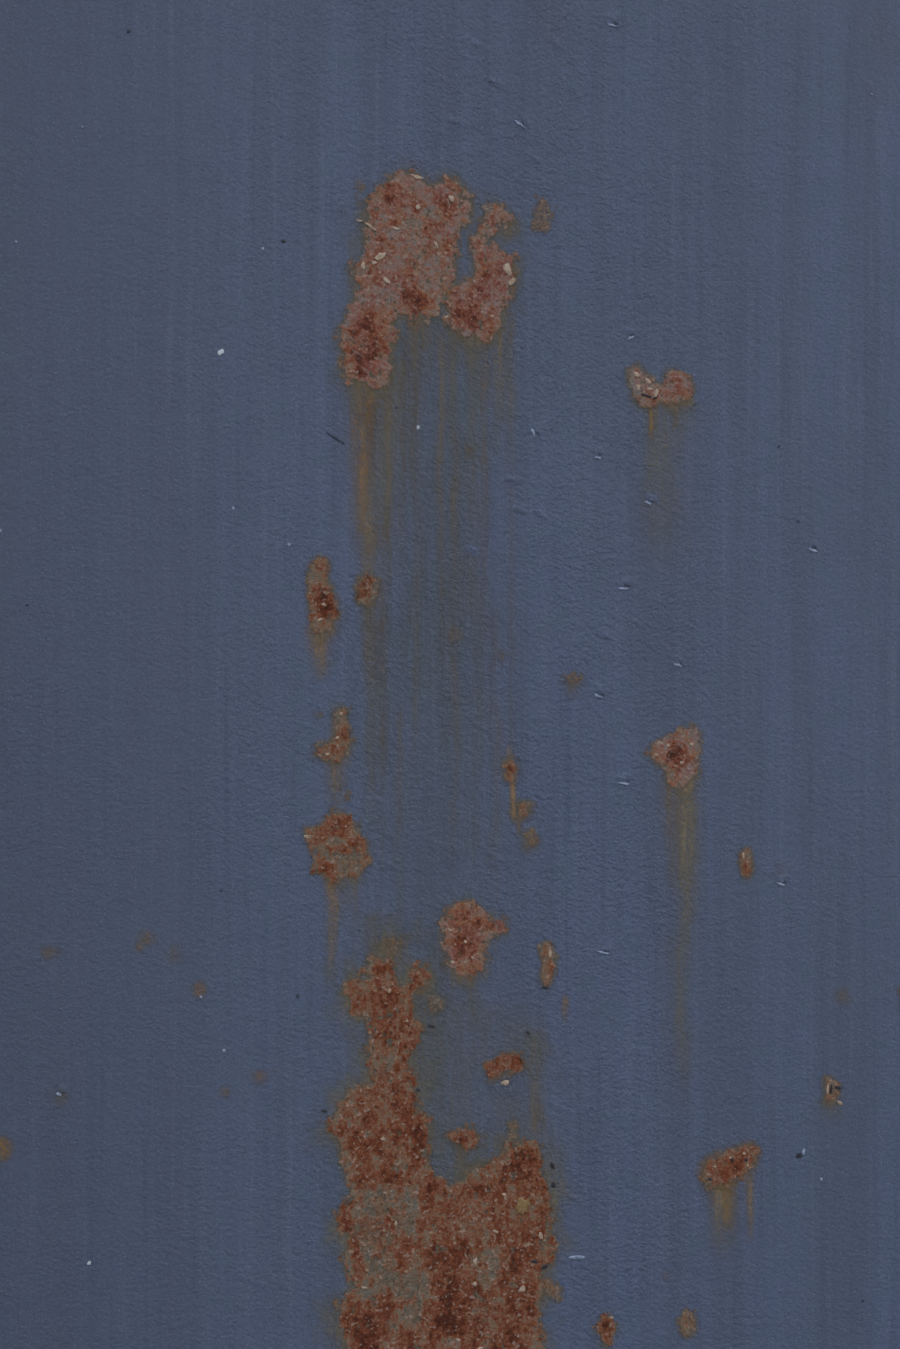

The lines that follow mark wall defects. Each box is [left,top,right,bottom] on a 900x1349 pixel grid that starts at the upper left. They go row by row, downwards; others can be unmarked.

corrosion [332,168,521,608]
corrosion [627,363,695,436]
corrosion [305,555,340,665]
corrosion [304,705,373,915]
corrosion [501,750,539,847]
corrosion [646,723,704,933]
corrosion [737,847,755,878]
corrosion [321,898,564,1349]
corrosion [823,1074,843,1105]
corrosion [698,1140,761,1227]
corrosion [592,1312,616,1346]